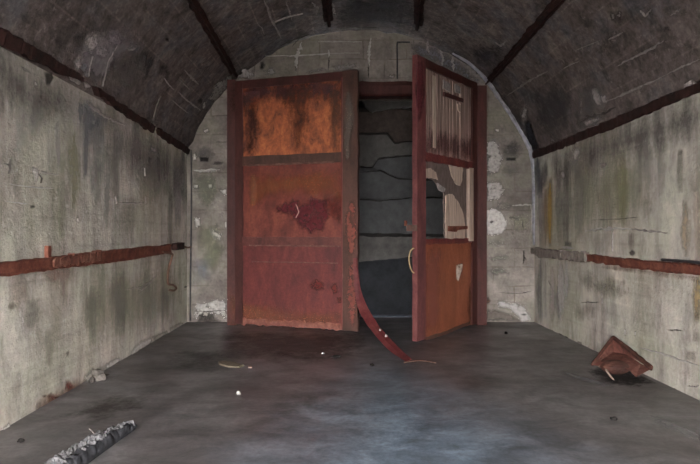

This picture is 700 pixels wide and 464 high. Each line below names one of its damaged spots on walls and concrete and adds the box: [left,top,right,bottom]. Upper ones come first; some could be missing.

damp [55,99,184,223]
corrosion [243,97,259,153]
corrosion [329,89,354,159]
flaking render [487,141,518,173]
flaking render [487,182,532,235]
damp [535,157,547,234]
damp [555,105,698,238]
spalling [193,300,227,322]